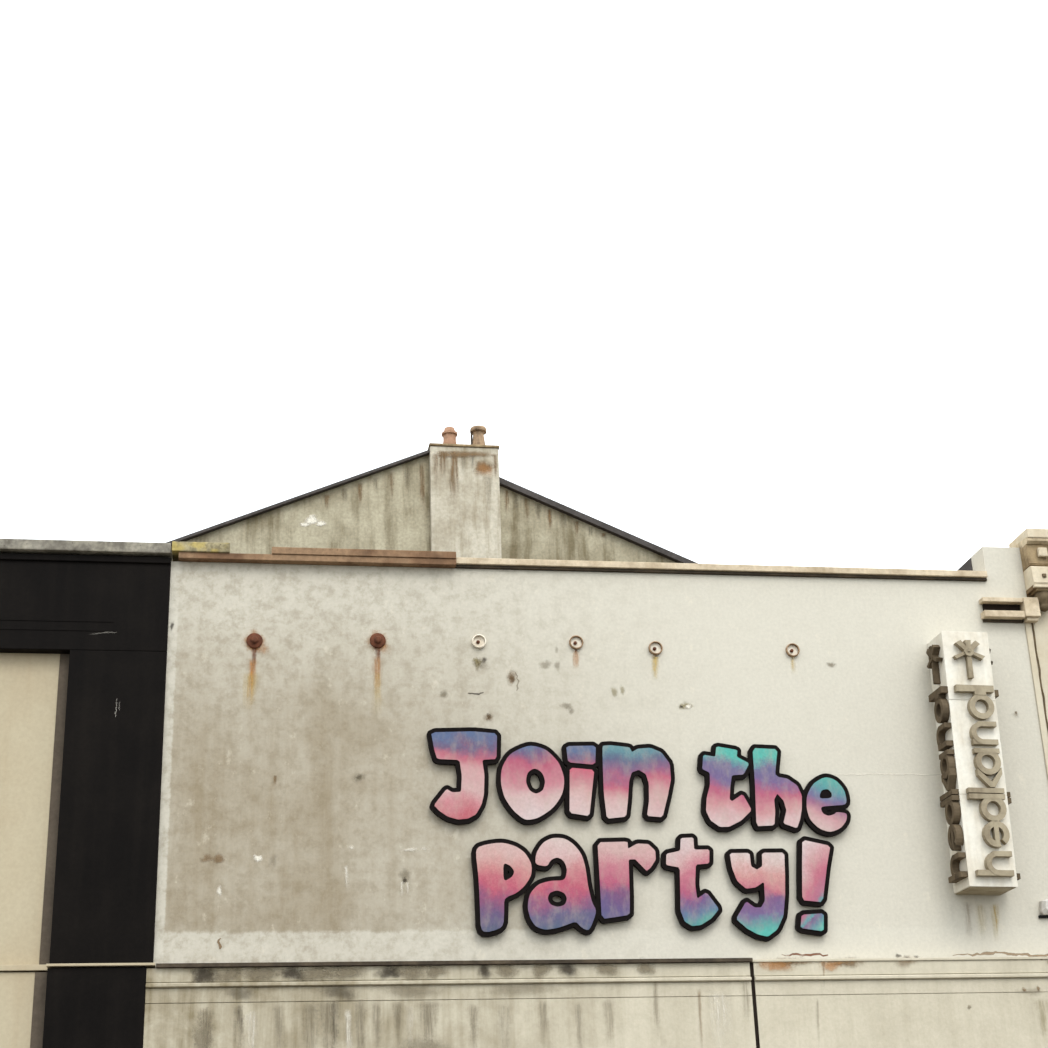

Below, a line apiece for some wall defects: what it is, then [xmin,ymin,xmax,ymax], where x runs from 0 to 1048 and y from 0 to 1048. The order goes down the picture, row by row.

water stain [435,451,497,490]
water stain [195,967,358,983]
water stain [382,967,444,979]
water stain [480,964,514,976]